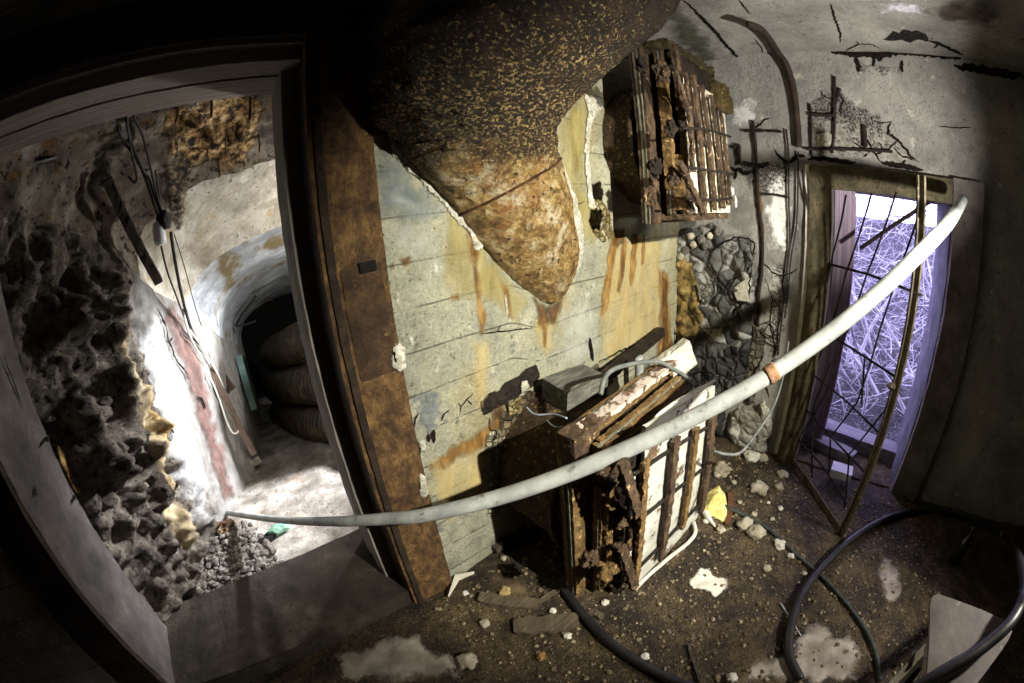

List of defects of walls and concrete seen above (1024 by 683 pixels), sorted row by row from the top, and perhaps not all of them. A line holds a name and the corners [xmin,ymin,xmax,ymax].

crack [682,0,763,57]
crack [830,3,1024,80]
spalling [805,76,908,162]
spalling [165,95,262,230]
spalling [558,94,614,280]
corrosion [470,236,478,264]
corrosion [476,279,486,332]
corrosion [534,298,562,347]
corrosion [601,230,672,356]